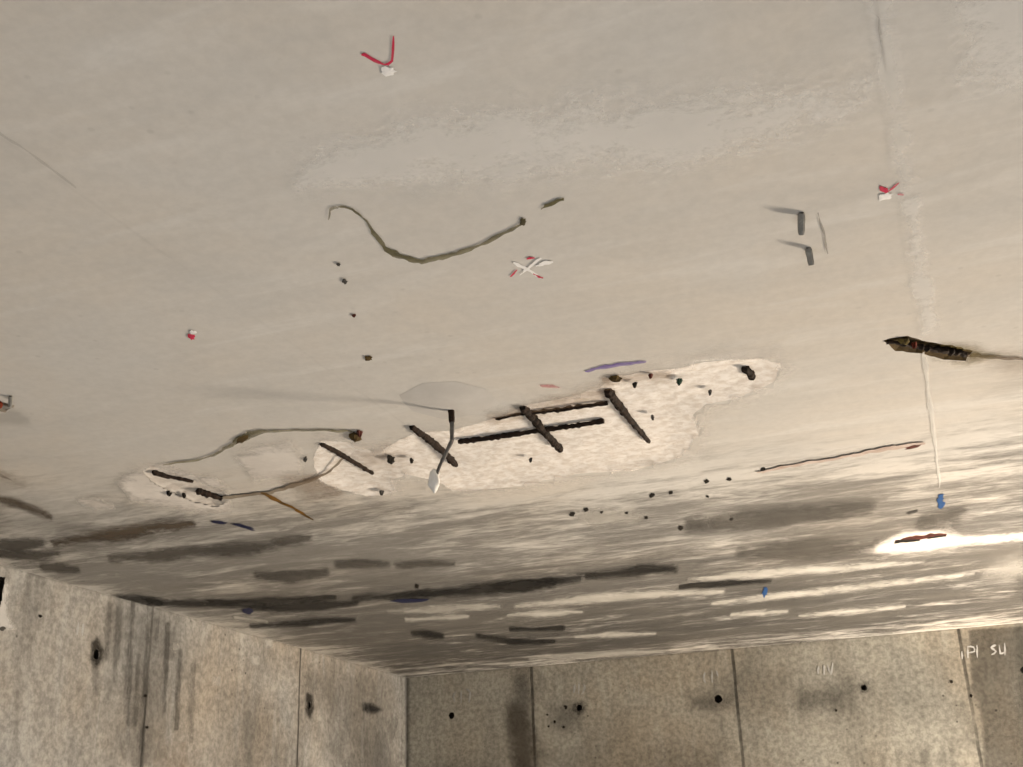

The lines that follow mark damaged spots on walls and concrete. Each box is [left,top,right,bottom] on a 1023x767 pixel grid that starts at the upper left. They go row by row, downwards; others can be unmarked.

crack [328,198,564,264]
crack [818,213,828,254]
spalling [236,358,781,497]
water stain [0,497,52,519]
spalling [119,464,230,513]
water stain [688,503,870,530]
water stain [919,510,963,527]
water stain [0,521,195,573]
water stain [109,536,310,561]
water stain [119,542,973,660]